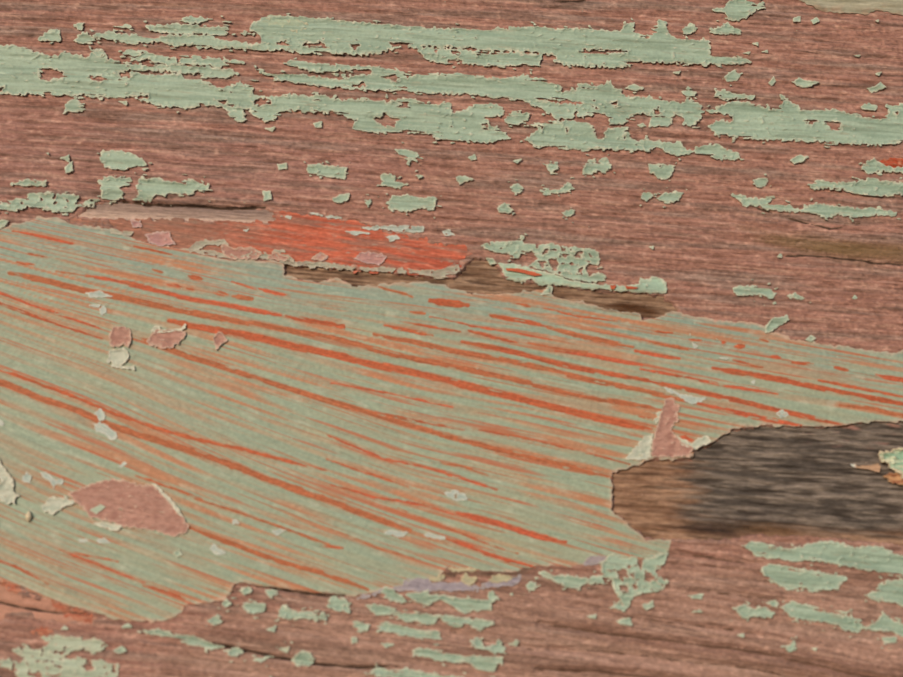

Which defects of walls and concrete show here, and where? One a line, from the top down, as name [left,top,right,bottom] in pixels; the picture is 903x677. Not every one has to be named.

peeling [0,0,903,242]
peeling [110,219,176,247]
peeling [85,290,113,316]
peeling [107,326,135,370]
spalling [189,233,678,318]
peeling [733,279,811,304]
peeling [765,314,789,334]
peeling [93,408,117,440]
peeling [0,461,189,543]
peeling [612,387,903,649]
peeling [206,552,669,677]
peeling [122,623,315,677]